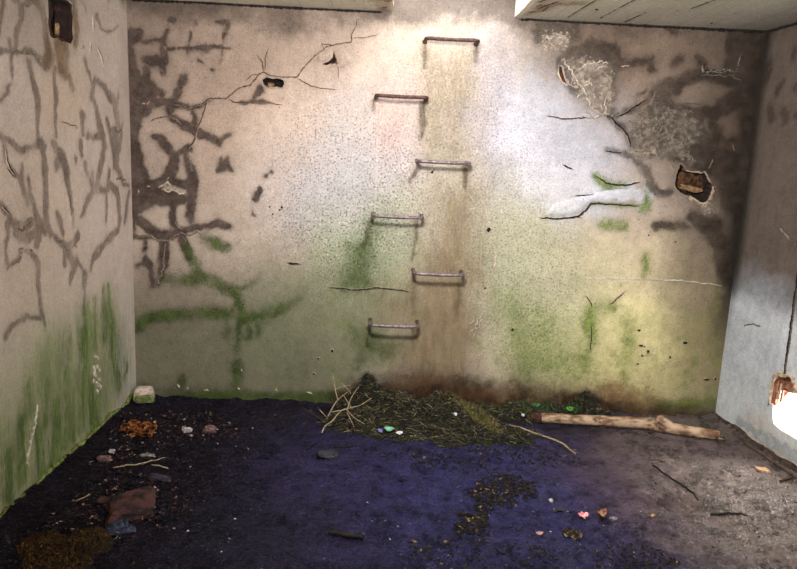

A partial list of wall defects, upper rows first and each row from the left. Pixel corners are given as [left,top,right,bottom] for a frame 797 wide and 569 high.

corrosion [45,1,79,78]
crack [132,0,382,150]
crack [518,0,797,34]
water stain [0,0,233,340]
crack [547,114,585,122]
crack [539,176,639,220]
crack [604,99,646,154]
water stain [534,22,763,284]
spalling [675,164,715,206]
crack [783,274,797,374]
water stain [5,283,128,504]
spalling [767,370,797,406]